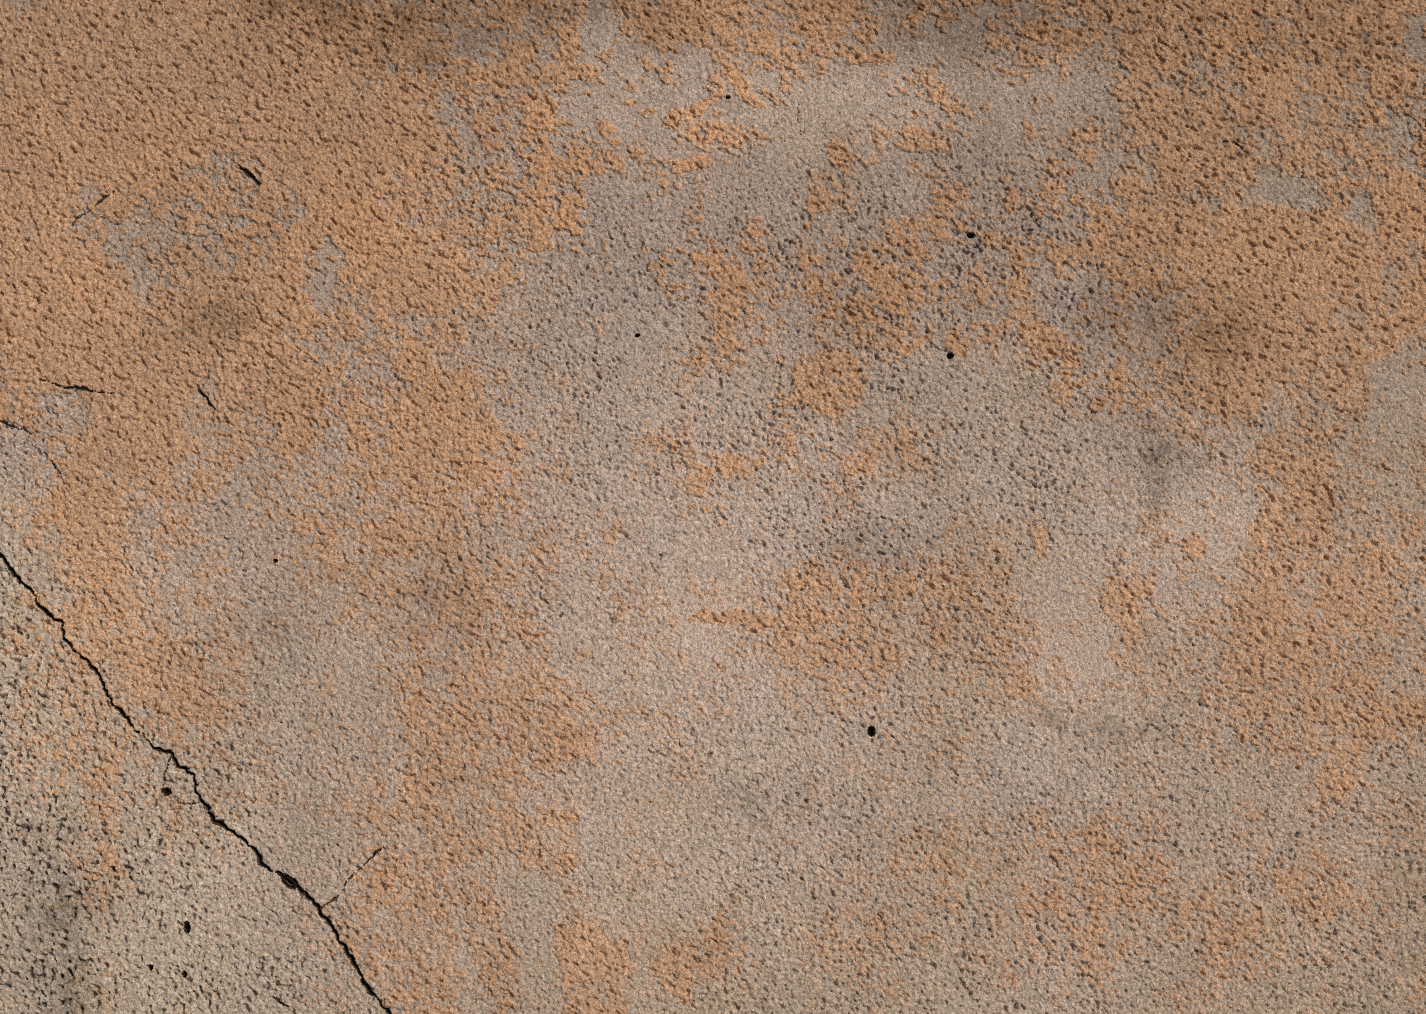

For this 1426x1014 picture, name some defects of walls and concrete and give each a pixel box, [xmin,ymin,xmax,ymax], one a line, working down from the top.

peeling [1391,98,1426,194]
peeling [55,163,287,284]
peeling [0,420,58,534]
crack [0,421,61,474]
crack [40,379,114,394]
crack [197,386,215,409]
peeling [462,0,1172,923]
peeling [1125,471,1426,755]
spalling [0,599,347,1014]
crack [0,552,392,1014]
peeling [464,903,520,1014]
peeling [554,915,699,1014]